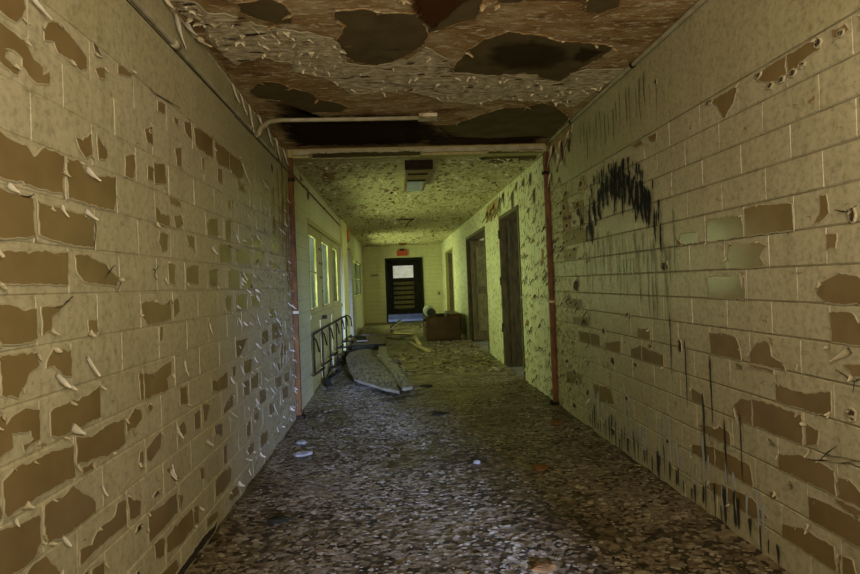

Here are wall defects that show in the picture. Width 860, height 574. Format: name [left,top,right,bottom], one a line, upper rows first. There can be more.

peeling [753,14,860,90]
peeling [704,84,739,119]
water stain [579,157,675,315]
peeling [721,202,795,270]
peeling [0,0,664,574]